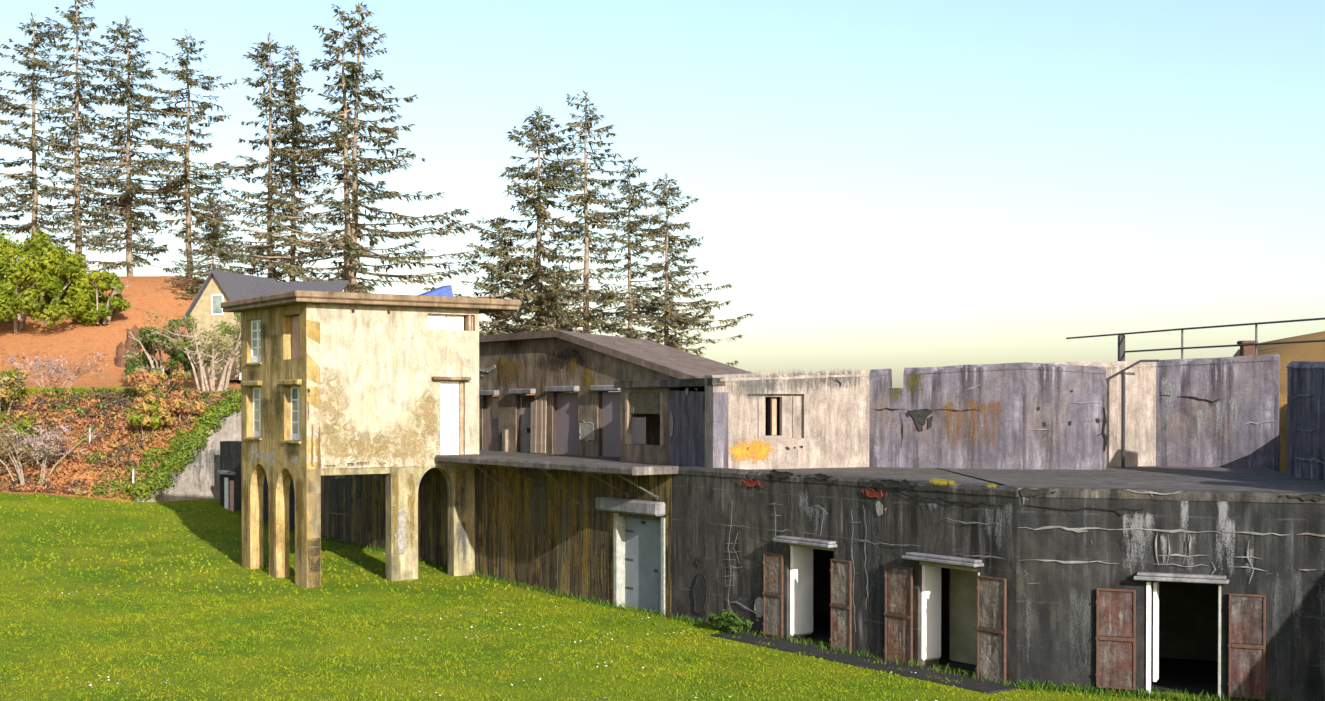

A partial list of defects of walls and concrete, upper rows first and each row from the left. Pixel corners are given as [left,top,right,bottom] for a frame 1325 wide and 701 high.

damp [1123,513,1166,567]
damp [1180,501,1195,569]